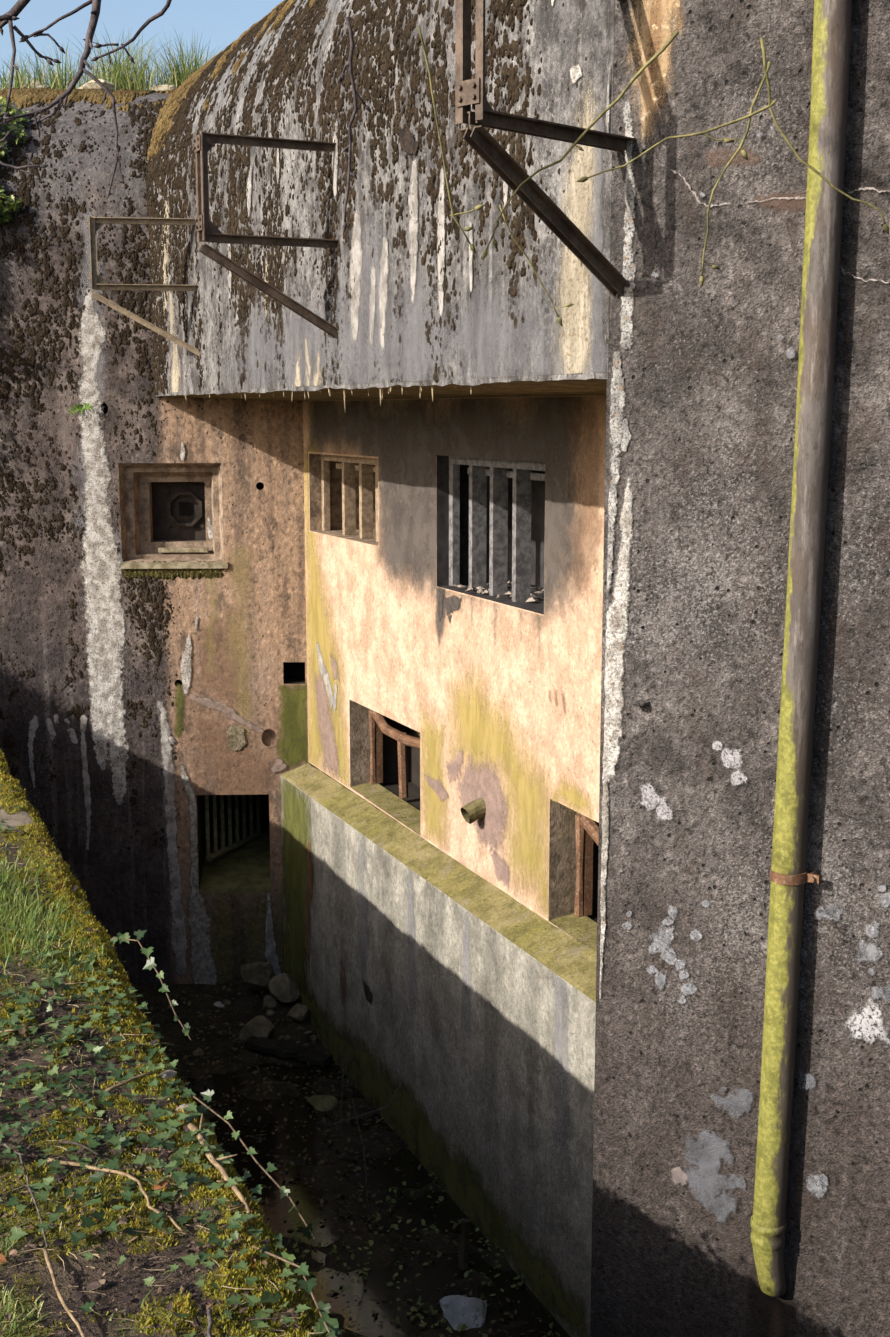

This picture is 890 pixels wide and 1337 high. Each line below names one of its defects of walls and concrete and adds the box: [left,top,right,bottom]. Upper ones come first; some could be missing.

leakage [570,64,582,83]
leakage [583,67,610,133]
corrosion [632,0,682,135]
leakage [162,201,180,392]
efflorescence [27,288,129,850]
leakage [157,617,218,985]
leakage [240,145,633,1337]
peeling [640,784,672,820]
peeling [712,741,747,785]
peeling [647,906,697,1004]
peeling [857,923,890,1003]
peeling [685,1130,746,1222]